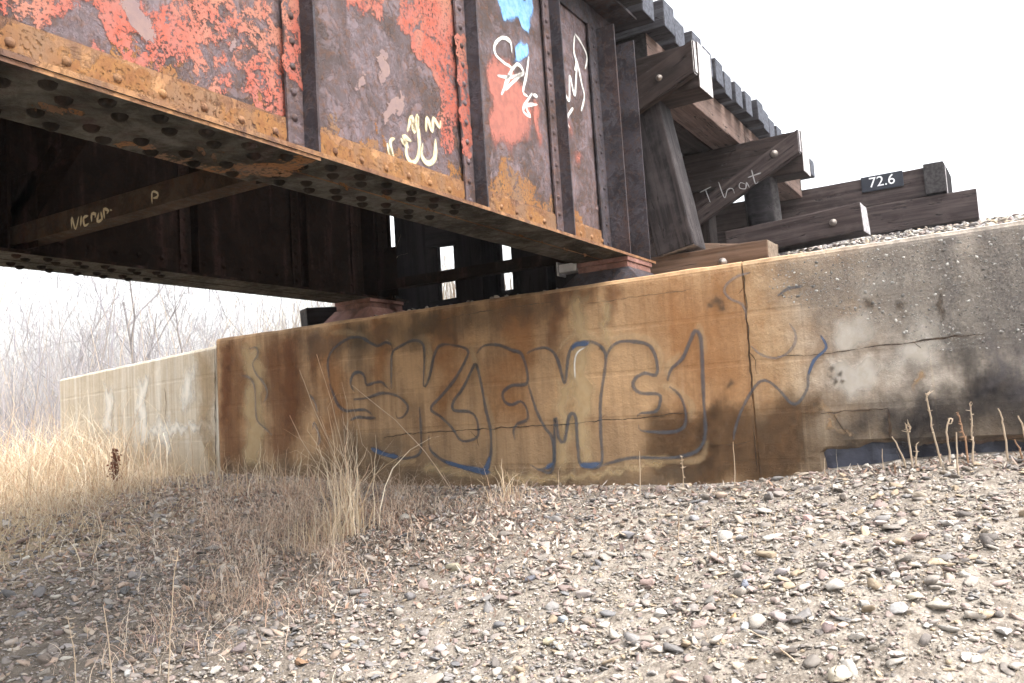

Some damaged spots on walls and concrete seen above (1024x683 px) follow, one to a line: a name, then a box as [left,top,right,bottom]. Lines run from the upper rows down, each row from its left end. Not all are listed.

peeling [0,0,303,141]
peeling [320,0,473,199]
rust [112,141,316,178]
peeling [574,209,603,244]
rust [219,347,247,463]
rust [267,341,306,452]
crack [384,412,689,446]
crack [702,266,986,471]
leakage [836,315,873,349]
leakage [835,359,878,394]
leakage [883,312,1024,441]